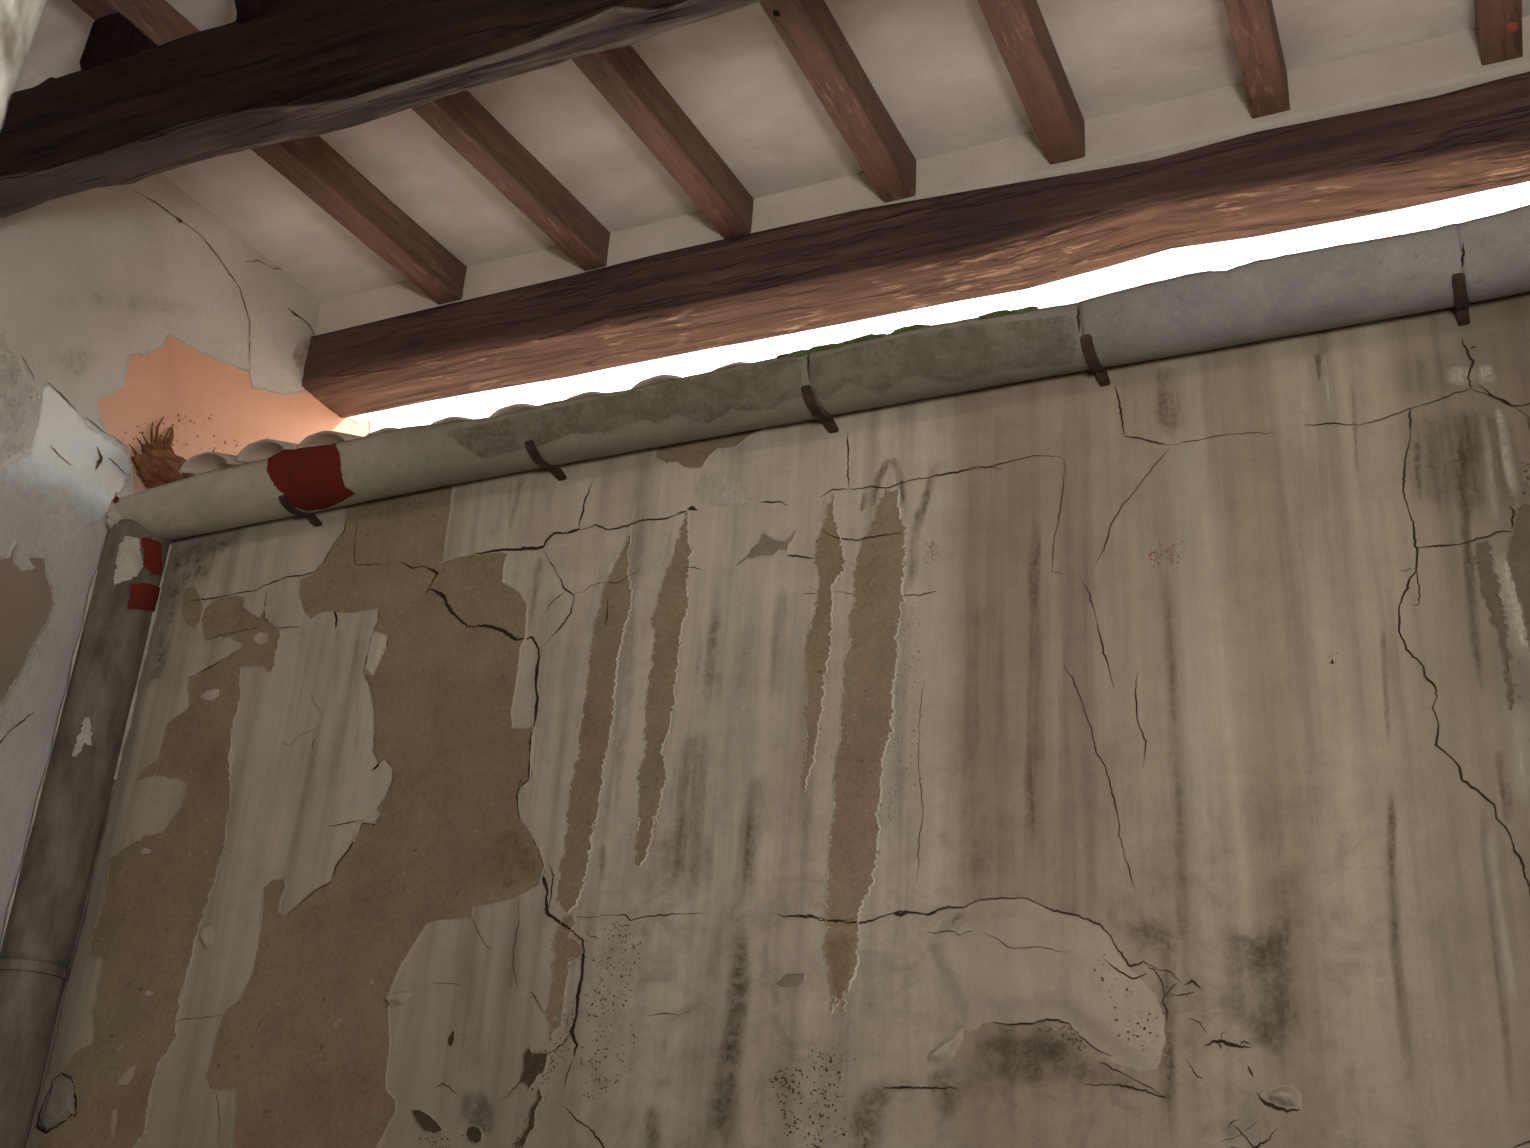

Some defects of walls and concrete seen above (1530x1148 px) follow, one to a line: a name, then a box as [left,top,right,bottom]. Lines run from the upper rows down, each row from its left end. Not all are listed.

peeling [95,333,371,494]
peeling [0,539,55,715]
peeling [37,586,281,1148]
peeling [205,484,633,1148]
leakage [539,921,641,1107]
peeling [630,506,694,874]
leakage [769,1050,872,1148]
peeling [798,482,914,1017]
crack [780,687,1300,1148]
leakage [1093,955,1172,1102]
crack [764,339,1530,893]
leakage [1504,562,1528,645]